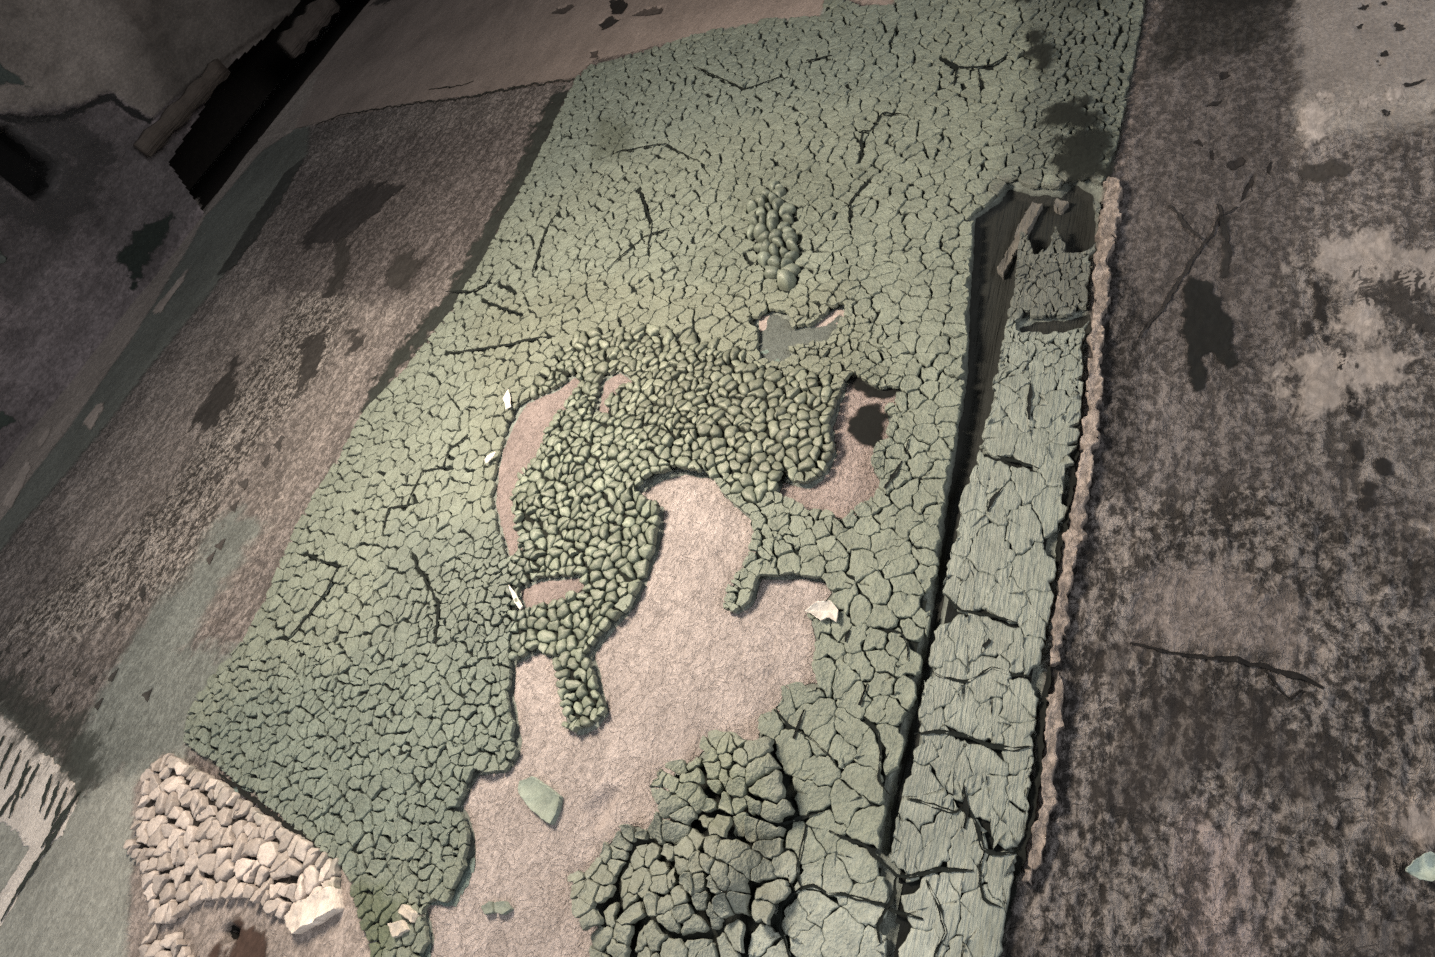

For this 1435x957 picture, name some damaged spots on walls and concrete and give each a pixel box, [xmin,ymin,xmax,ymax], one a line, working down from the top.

damp [1016,23,1059,73]
damp [1038,95,1117,190]
spalling [230,478,248,513]
spalling [261,435,284,468]
flaking render [484,378,580,556]
flaking render [599,373,632,413]
crack [183,0,1145,957]
flaking render [780,383,896,519]
flaking render [387,475,838,957]
crack [1130,642,1324,699]
peeling [0,712,79,927]
peeling [123,753,344,957]